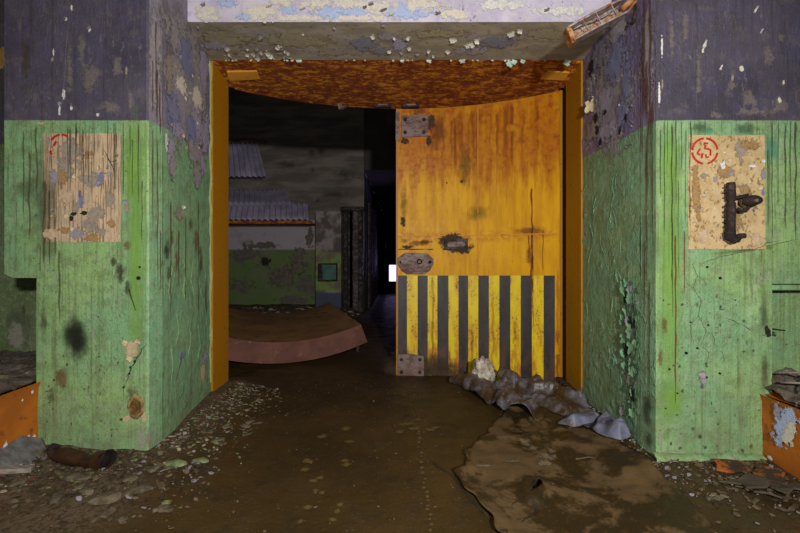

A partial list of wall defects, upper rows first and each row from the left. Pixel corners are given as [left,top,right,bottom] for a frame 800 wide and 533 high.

peeling [156,0,584,189]
rust [426,115,436,146]
peeling [584,7,641,159]
peeling [122,338,141,362]
spalling [120,393,147,423]
rust [528,189,544,302]
peeling [619,267,640,419]
crack [686,239,798,360]